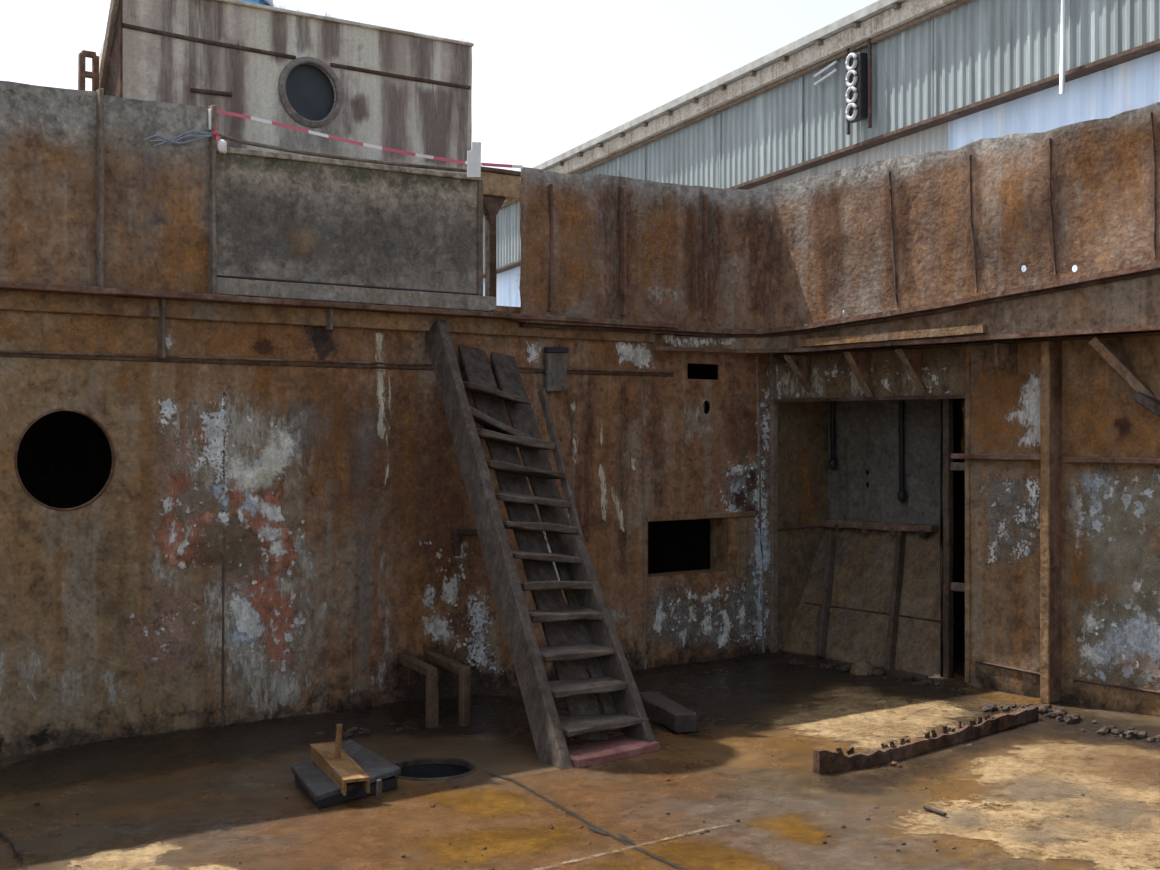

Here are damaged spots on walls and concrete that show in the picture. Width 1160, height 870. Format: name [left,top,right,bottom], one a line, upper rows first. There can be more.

peeling [527,344,541,363]
peeling [616,341,654,368]
peeling [870,360,949,396]
peeling [129,392,326,715]
peeling [419,540,504,675]
peeling [646,364,864,652]
peeling [978,474,1041,566]
peeling [1068,456,1160,699]
crack [486,772,686,870]